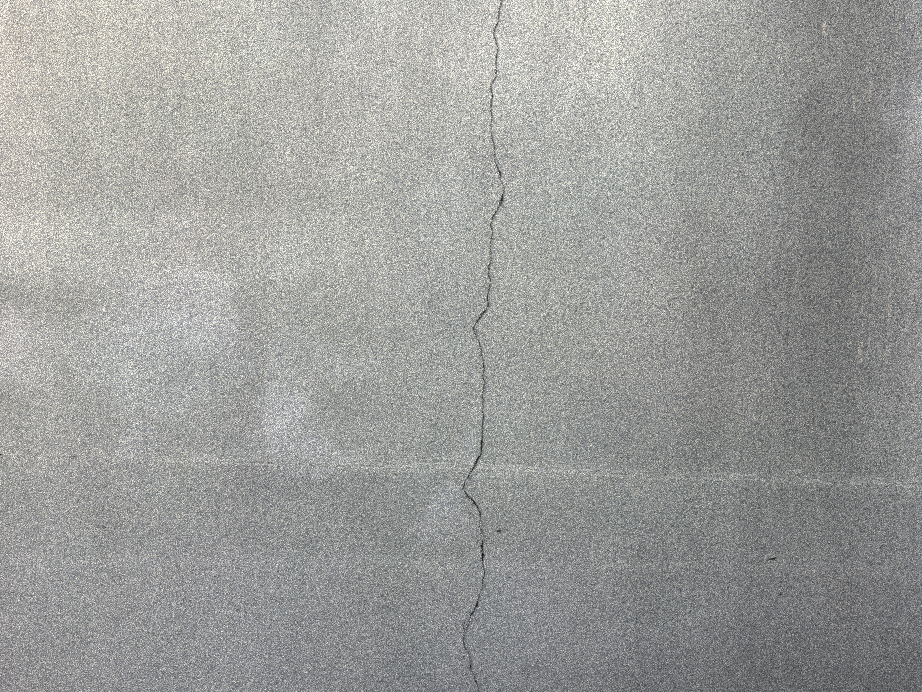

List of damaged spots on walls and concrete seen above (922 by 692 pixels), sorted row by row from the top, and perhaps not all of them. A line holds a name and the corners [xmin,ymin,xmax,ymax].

crack [463,0,505,690]